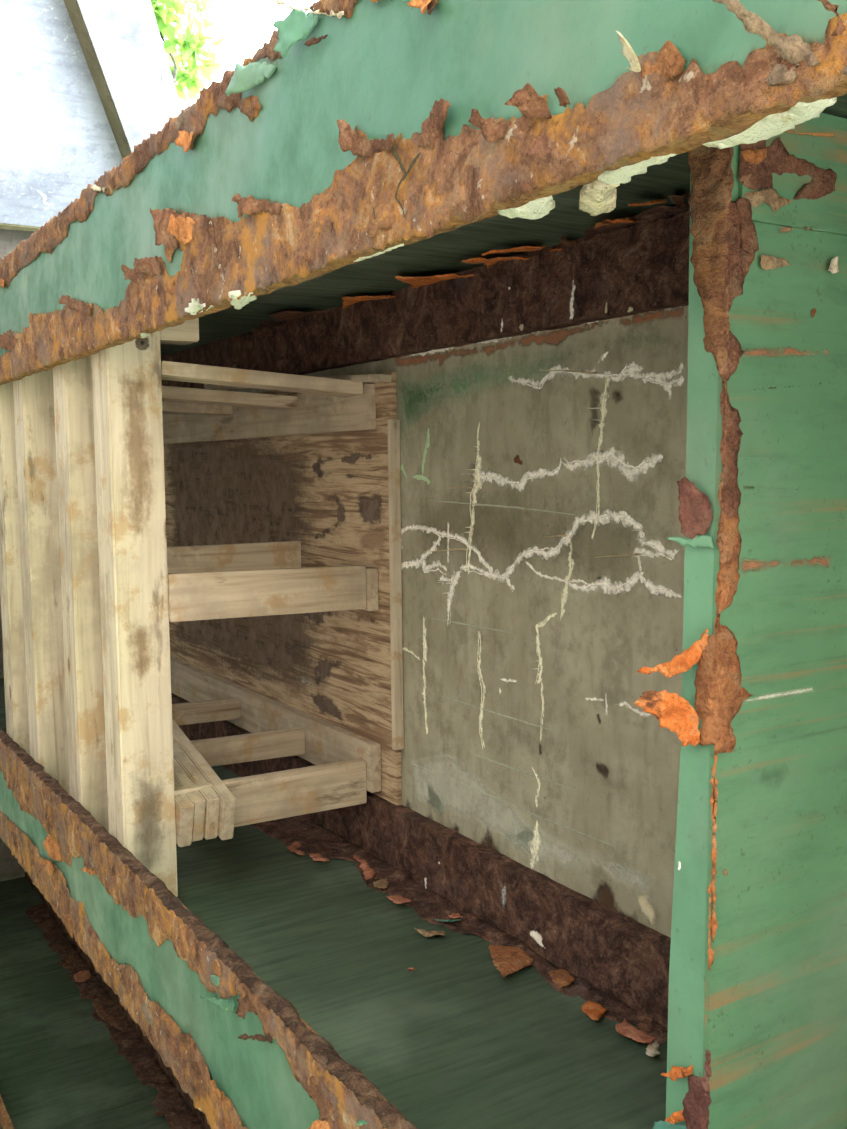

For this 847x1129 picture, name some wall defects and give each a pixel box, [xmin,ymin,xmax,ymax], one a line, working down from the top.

rust [0,0,847,385]
rust [395,137,837,971]
rust [0,729,418,1129]
rust [250,814,668,1057]
rust [652,1049,712,1129]